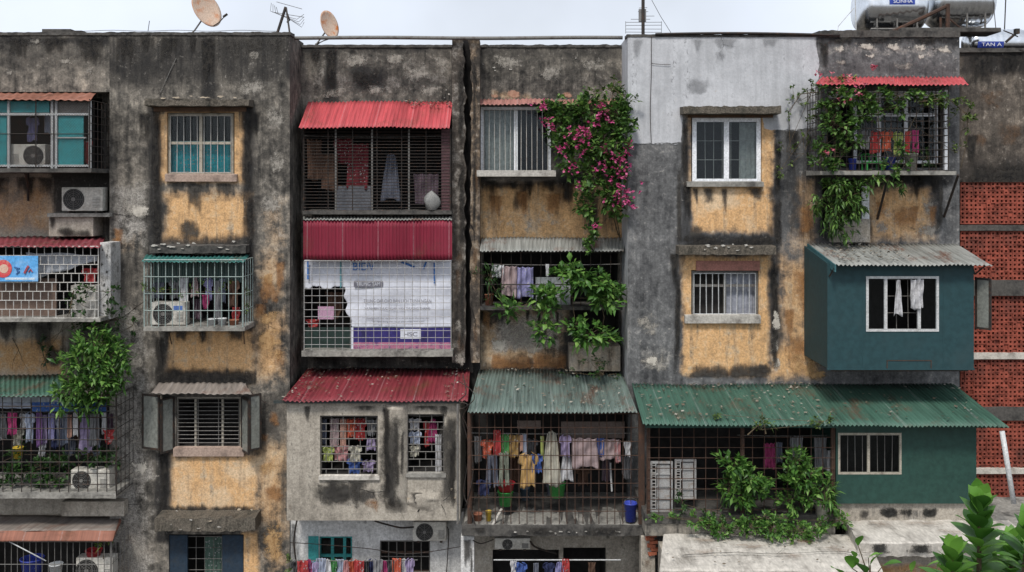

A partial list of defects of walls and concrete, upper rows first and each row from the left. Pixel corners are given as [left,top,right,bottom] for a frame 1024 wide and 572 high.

leakage [81,38,101,61]
leakage [190,38,214,77]
leakage [172,183,201,210]
leakage [217,183,230,195]
crack [458,40,477,373]
leakage [488,179,574,201]
leakage [677,126,798,246]
leakage [181,220,199,238]
leakage [670,254,681,355]
leakage [690,267,779,377]
leakage [318,406,404,507]